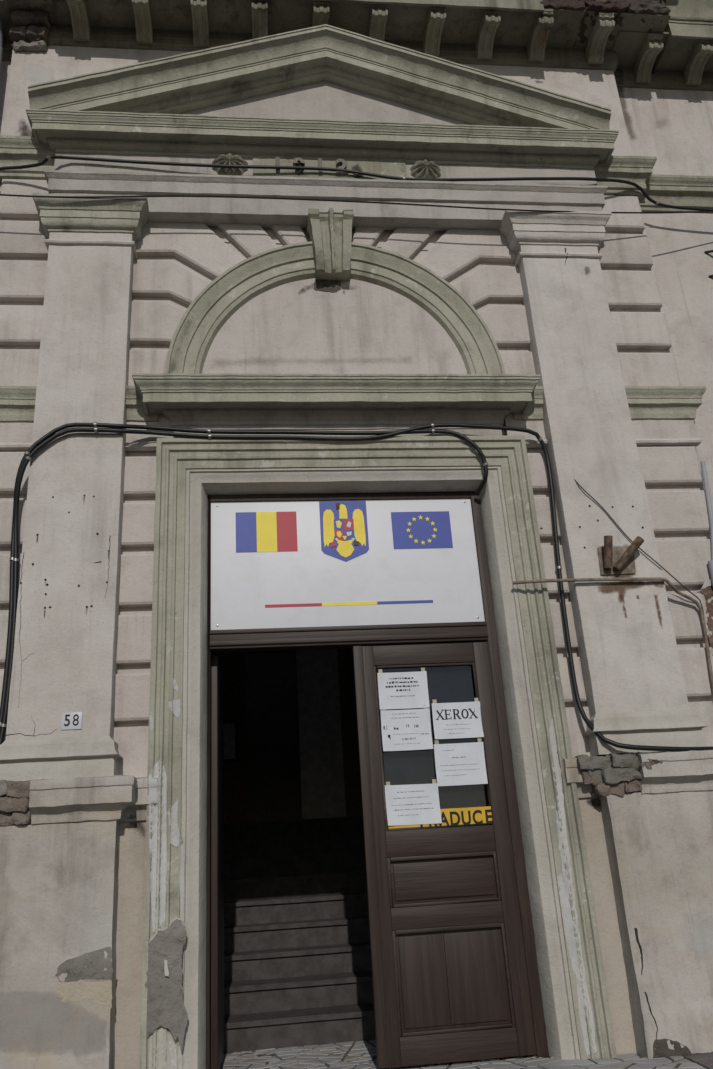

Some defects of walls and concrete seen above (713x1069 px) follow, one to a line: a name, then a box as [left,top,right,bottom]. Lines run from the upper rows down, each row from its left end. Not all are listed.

spalling [5,0,54,52]
spalling [540,0,671,47]
rust [600,574,663,626]
spalling [575,751,663,797]
spalling [0,780,31,827]
peeling [549,715,597,1055]
flaking render [145,759,190,1069]
flaking render [53,947,118,1009]
crack [634,928,658,1058]